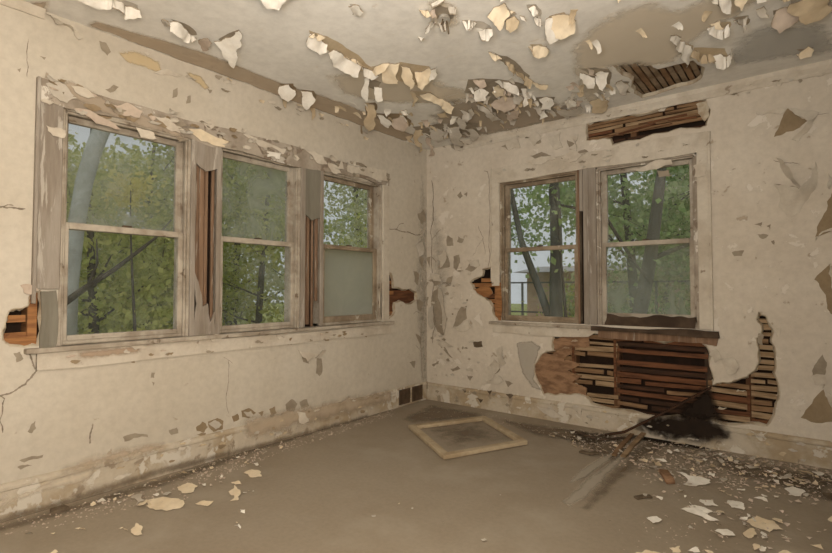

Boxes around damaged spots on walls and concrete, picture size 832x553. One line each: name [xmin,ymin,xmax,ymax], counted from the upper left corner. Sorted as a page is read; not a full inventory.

peeling [261,0,286,10]
peeling [306,0,832,171]
peeling [41,75,390,182]
crack [0,203,25,211]
flaking render [1,284,41,362]
peeling [380,236,563,418]
peeling [814,264,832,315]
crack [0,354,37,433]
flaking render [534,312,781,436]
peeling [801,354,832,423]
water stain [0,392,391,530]
peeling [639,437,832,489]